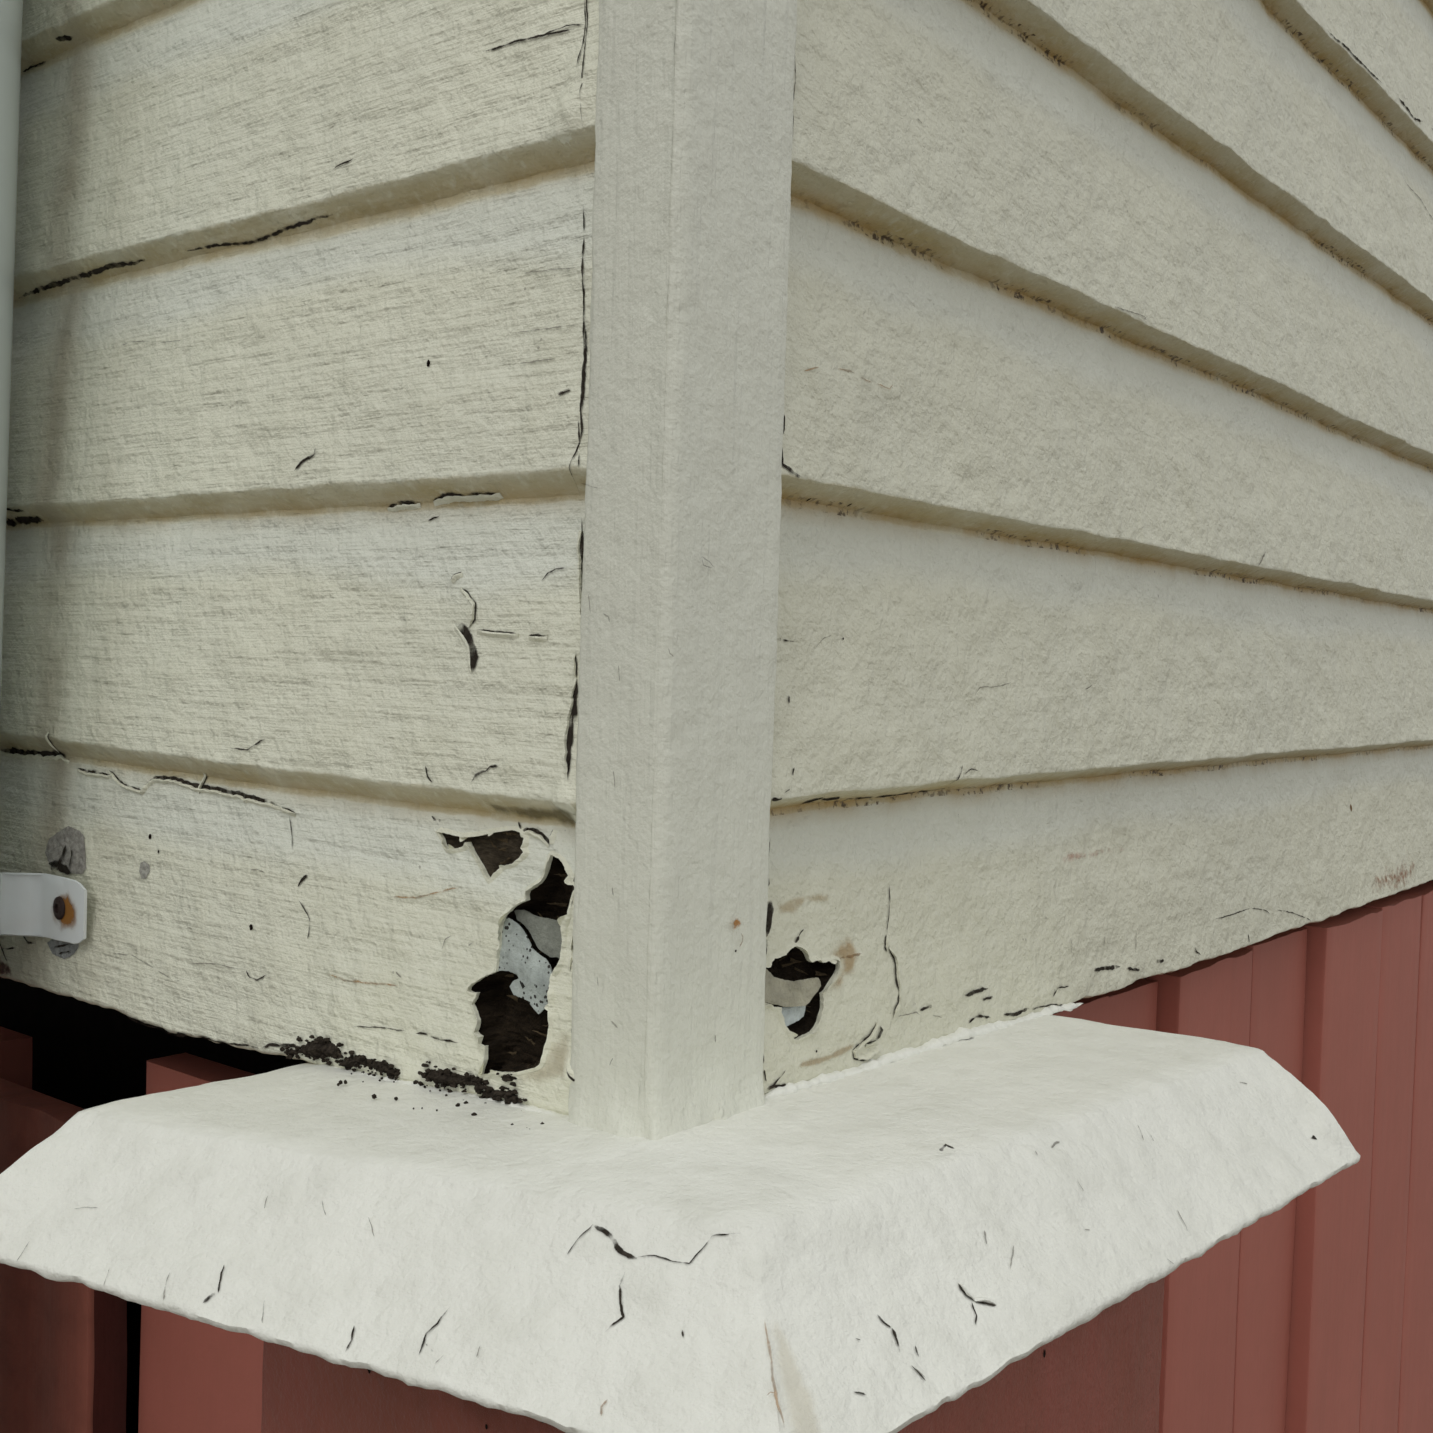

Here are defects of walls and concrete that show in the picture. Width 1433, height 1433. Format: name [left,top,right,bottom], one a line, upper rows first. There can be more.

crack [387,492,503,521]
crack [542,523,583,580]
crack [451,572,547,673]
crack [566,681,578,778]
peeling [435,826,530,884]
rust [60,896,75,926]
peeling [466,851,574,1080]
peeling [765,941,841,1044]
crack [848,885,1200,1061]
crack [1217,908,1310,942]
crack [568,1226,728,1325]